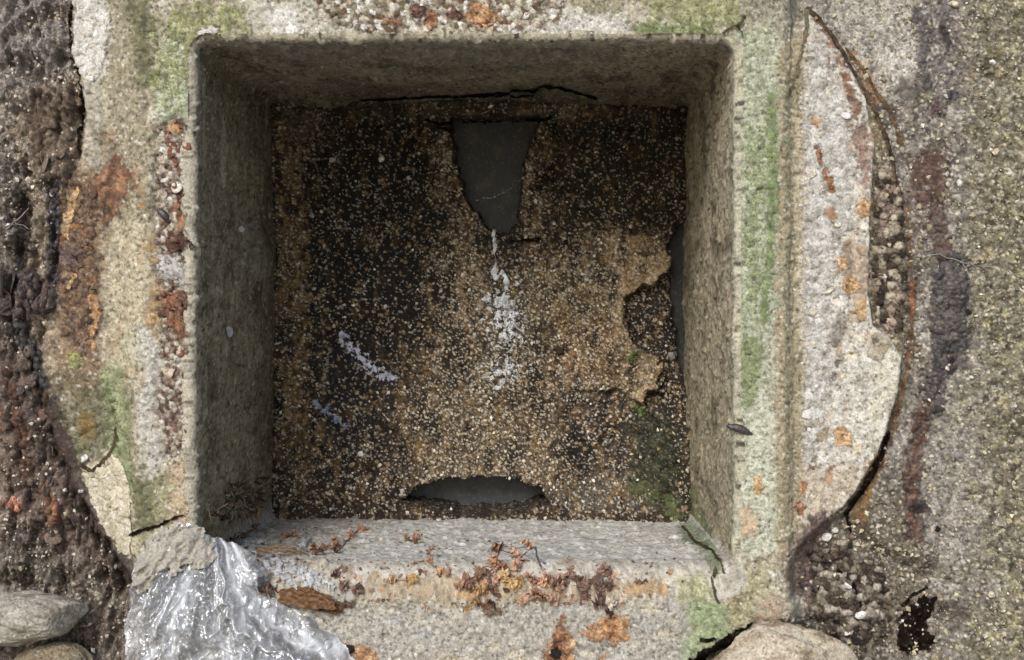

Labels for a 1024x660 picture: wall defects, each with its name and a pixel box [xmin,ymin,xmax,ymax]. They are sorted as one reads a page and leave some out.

crack [360,85,597,132]
rust [813,17,880,219]
crack [790,6,904,218]
rust [0,0,175,660]
peeling [270,99,692,523]
rust [835,237,873,323]
water stain [899,148,977,546]
crack [129,513,187,537]
crack [843,431,891,532]